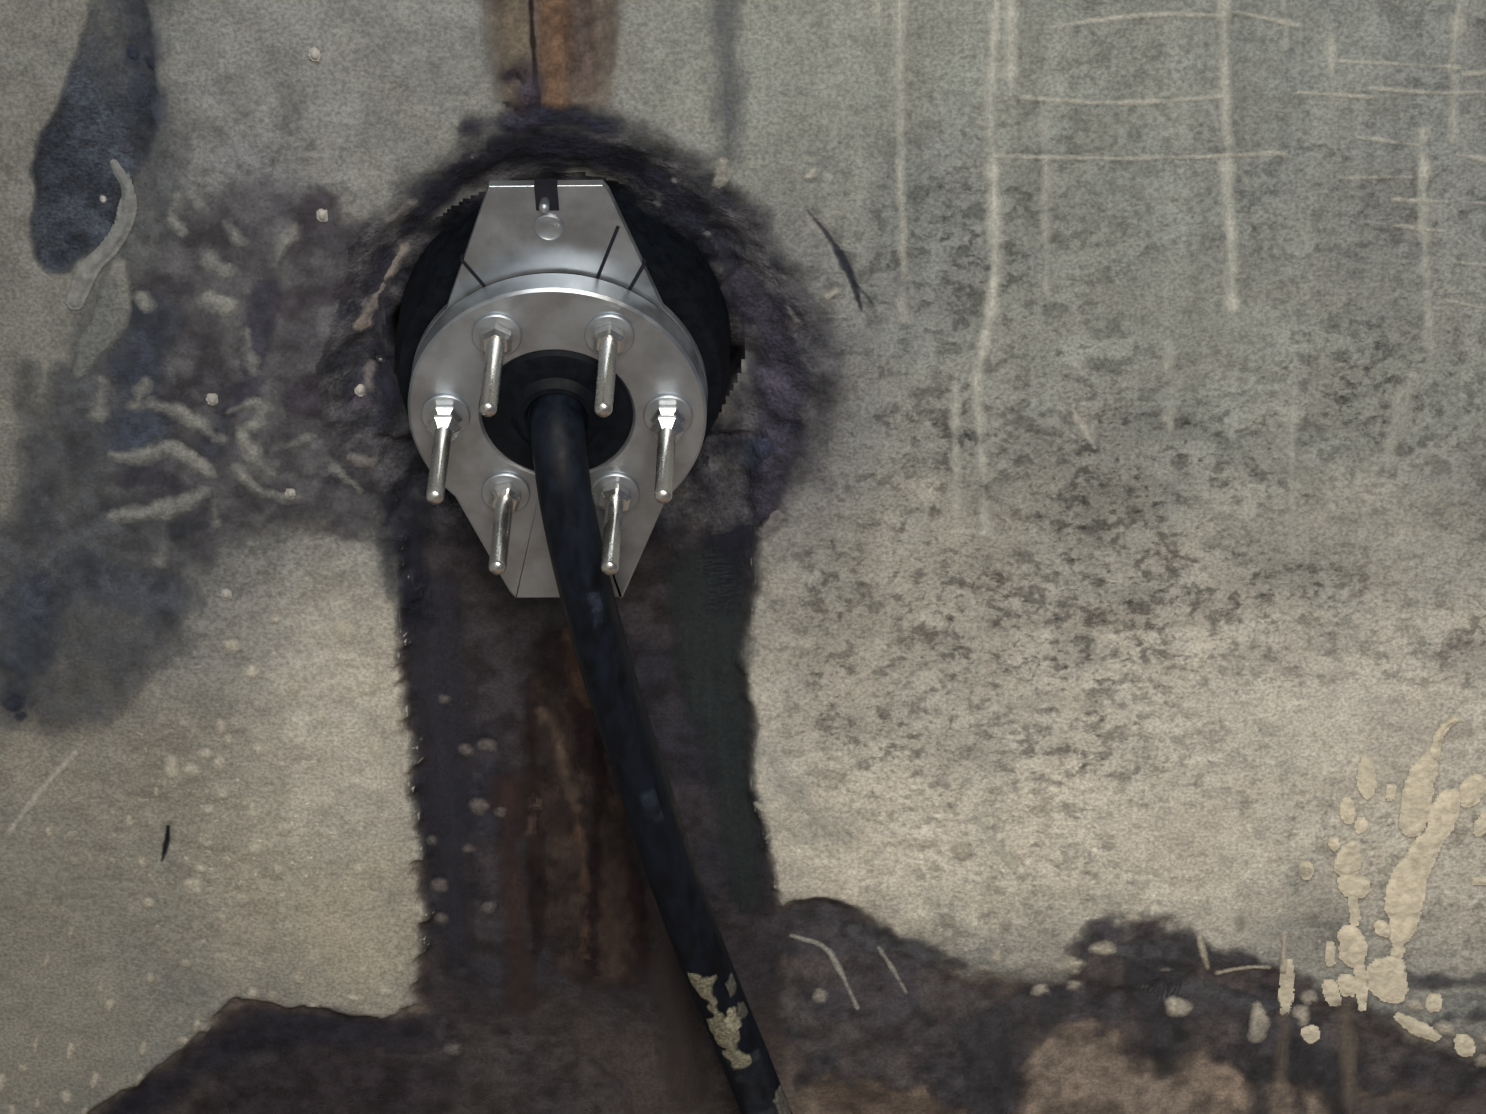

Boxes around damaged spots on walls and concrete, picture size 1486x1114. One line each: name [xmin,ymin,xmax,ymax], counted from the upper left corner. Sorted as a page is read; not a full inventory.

rust [486,0,613,113]
water stain [952,0,1017,472]
water stain [1219,0,1239,311]
water stain [1419,127,1429,241]
water stain [0,3,710,1114]
water stain [615,477,1486,1114]